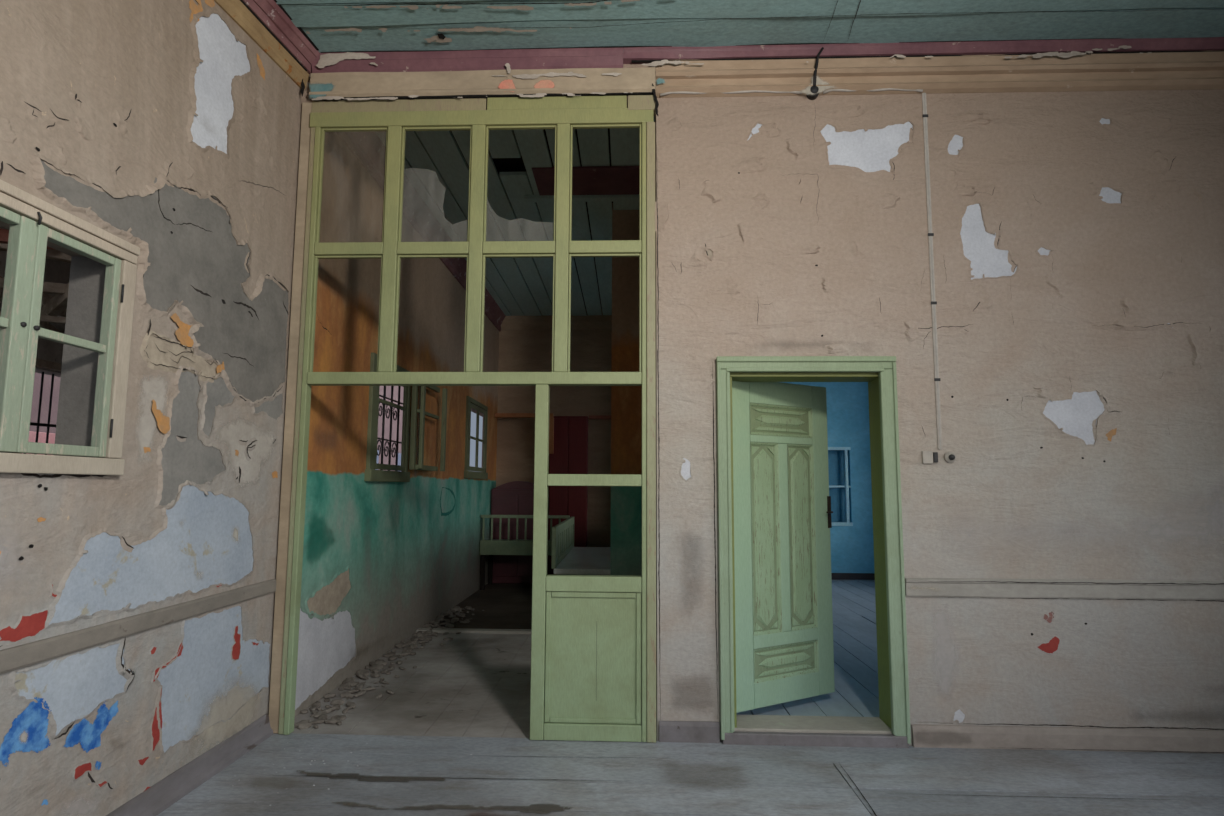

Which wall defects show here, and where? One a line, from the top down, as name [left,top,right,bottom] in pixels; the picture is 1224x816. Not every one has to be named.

peeling [186,0,265,159]
peeling [818,119,914,174]
peeling [945,133,965,158]
peeling [958,202,1019,282]
peeling [1096,185,1124,205]
spalling [0,147,290,644]
peeling [1040,389,1109,447]
peeling [0,638,136,790]
peeling [137,603,271,767]
peeling [295,565,357,713]